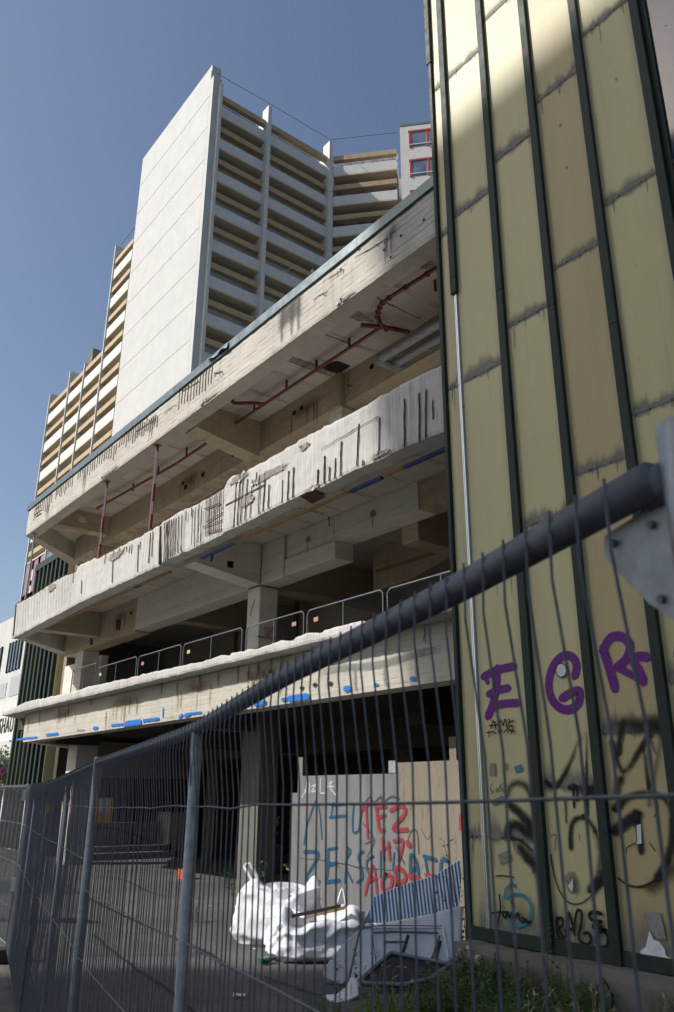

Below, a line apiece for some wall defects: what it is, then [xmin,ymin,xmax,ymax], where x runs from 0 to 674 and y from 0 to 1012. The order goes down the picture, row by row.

leakage [583,0,628,37]
leakage [537,66,576,103]
leakage [495,130,530,162]
leakage [605,171,656,206]
leakage [554,239,598,270]
leakage [279,295,299,340]